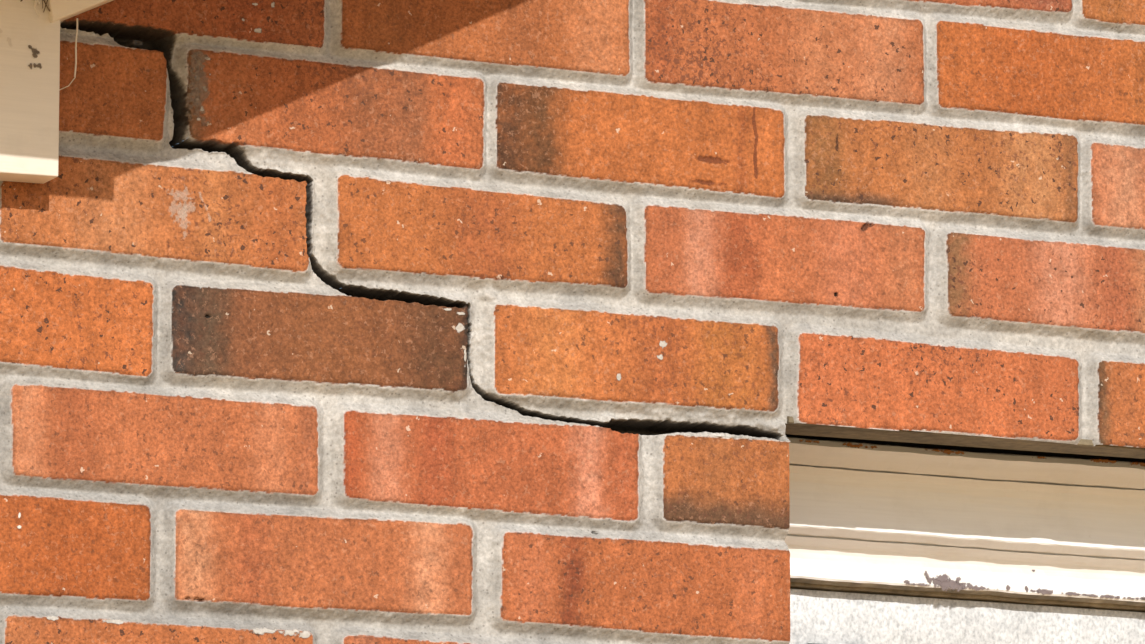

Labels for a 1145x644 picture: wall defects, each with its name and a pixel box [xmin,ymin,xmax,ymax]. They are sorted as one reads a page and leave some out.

crack [60,16,791,444]
peeling [904,571,989,591]
peeling [1025,586,1145,600]